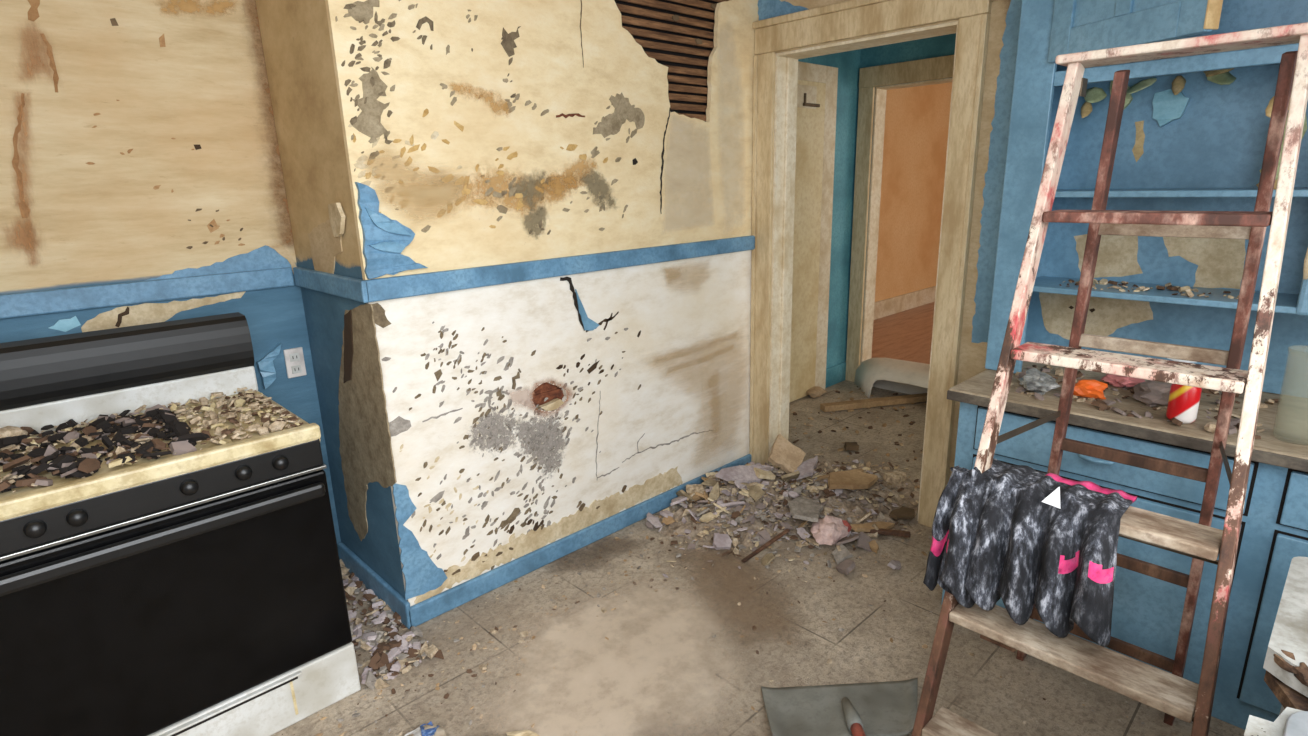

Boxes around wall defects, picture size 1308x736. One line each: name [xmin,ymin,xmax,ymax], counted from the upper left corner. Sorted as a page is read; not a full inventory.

flaking render [614,0,728,122]
peeling [757,0,809,20]
peeling [335,0,450,279]
water stain [348,124,628,236]
crack [660,108,671,212]
peeling [1074,234,1143,278]
peeling [1163,237,1246,289]
peeling [1039,292,1153,340]
peeling [338,289,683,604]